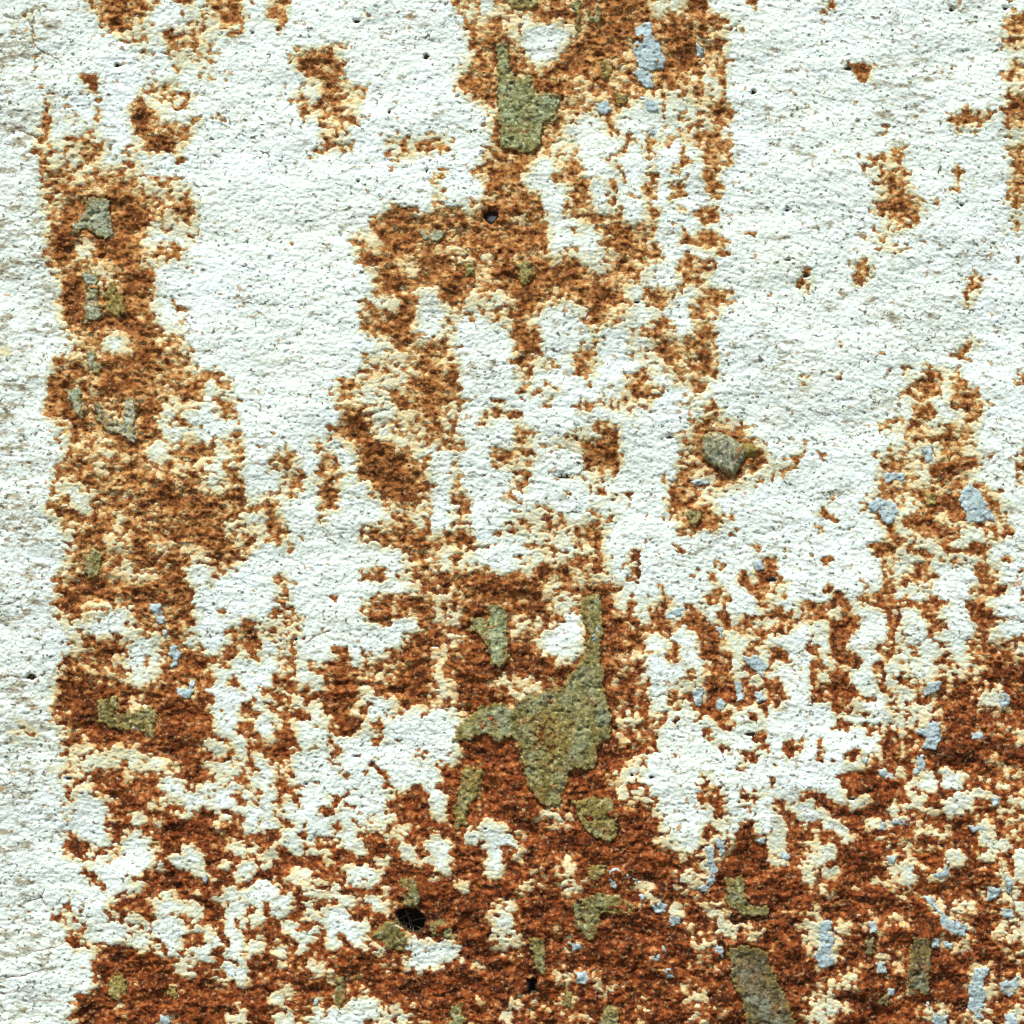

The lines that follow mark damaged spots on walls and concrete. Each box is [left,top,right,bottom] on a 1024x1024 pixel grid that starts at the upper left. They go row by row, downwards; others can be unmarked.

peeling [77,68,106,127]
spalling [284,41,371,160]
peeling [378,129,456,172]
spalling [848,124,965,287]
peeling [476,398,540,513]
spalling [540,419,634,508]
peeling [622,549,642,584]
peeling [702,727,772,772]
peeling [782,735,836,763]
peeling [315,788,357,818]
peeling [695,772,732,825]
peeling [79,867,106,891]